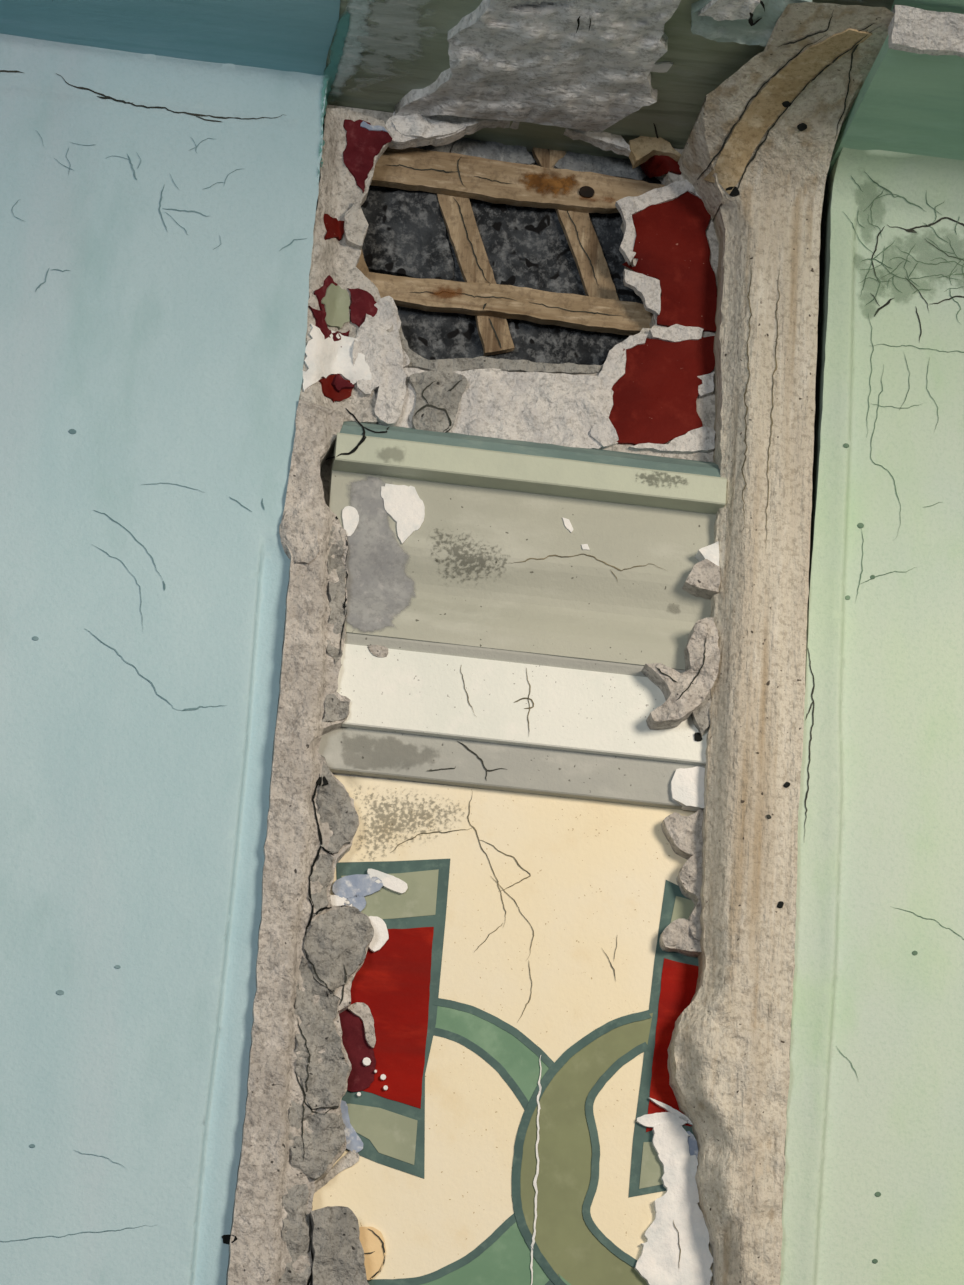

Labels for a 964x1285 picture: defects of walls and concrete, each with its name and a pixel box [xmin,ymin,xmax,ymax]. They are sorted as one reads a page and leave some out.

spalling [888,5,964,58]
crack [56,73,284,153]
crack [38,133,239,250]
crack [812,171,964,539]
crack [141,483,265,512]
crack [94,510,165,631]
crack [514,554,667,582]
crack [856,529,916,598]
crack [84,628,227,711]
spalling [222,0,812,1285]
crack [390,668,534,1021]